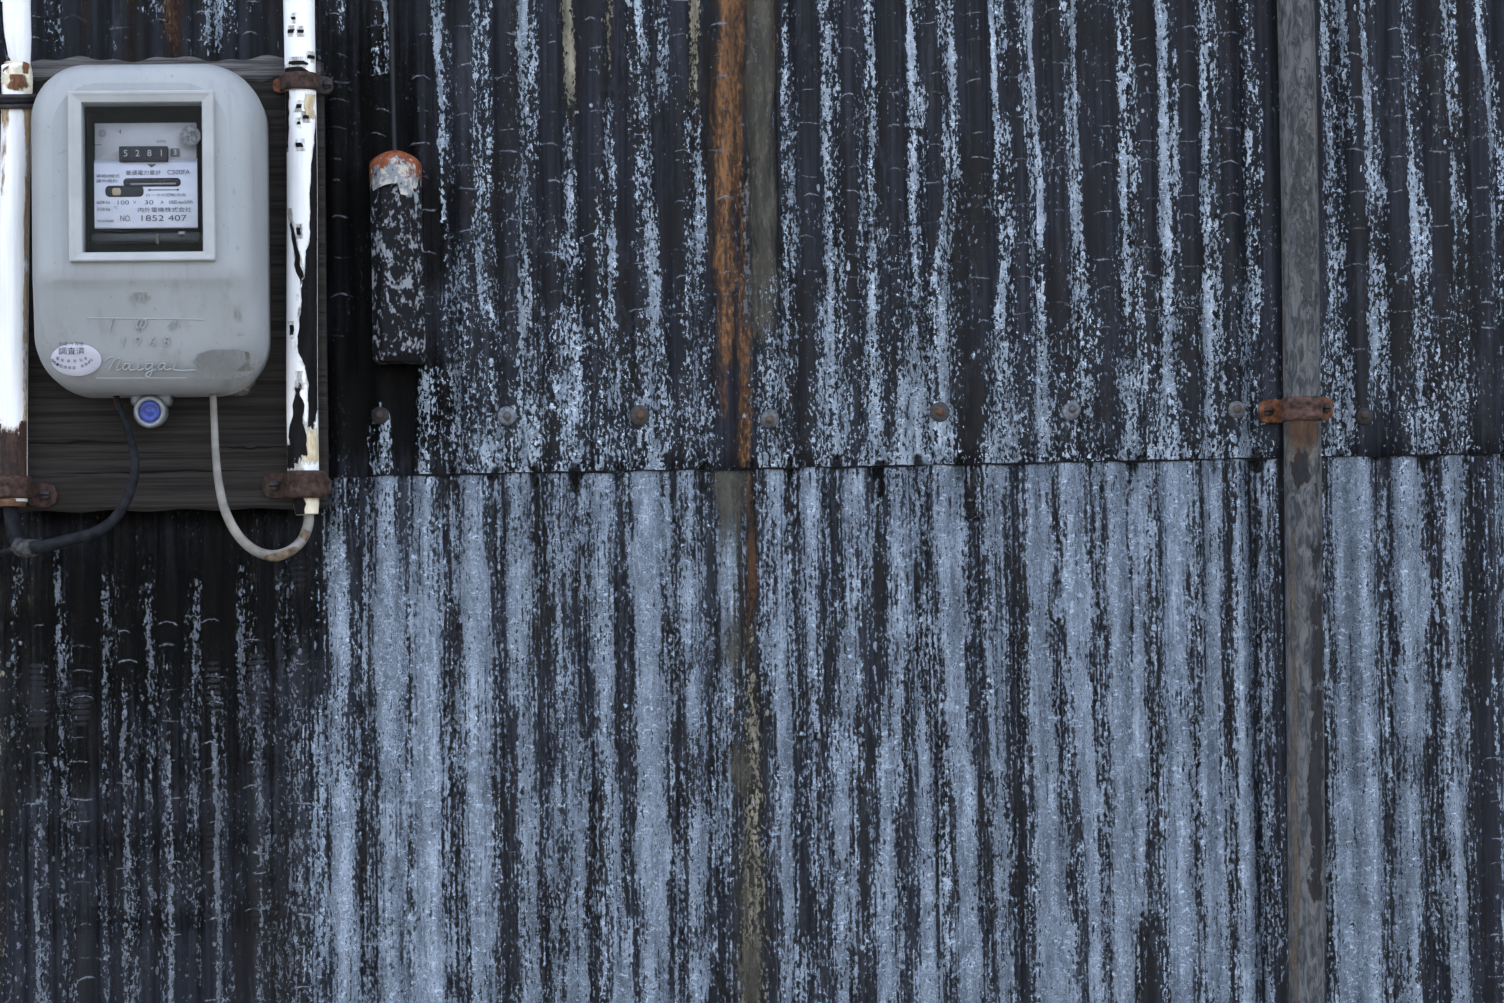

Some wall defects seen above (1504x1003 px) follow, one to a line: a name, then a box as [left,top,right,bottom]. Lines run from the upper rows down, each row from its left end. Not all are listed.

rust [0,109,31,475]
rust [3,62,30,91]
rust [369,150,422,183]
peeling [96,0,1289,1003]
rust [710,0,758,664]
peeling [1290,0,1504,1003]